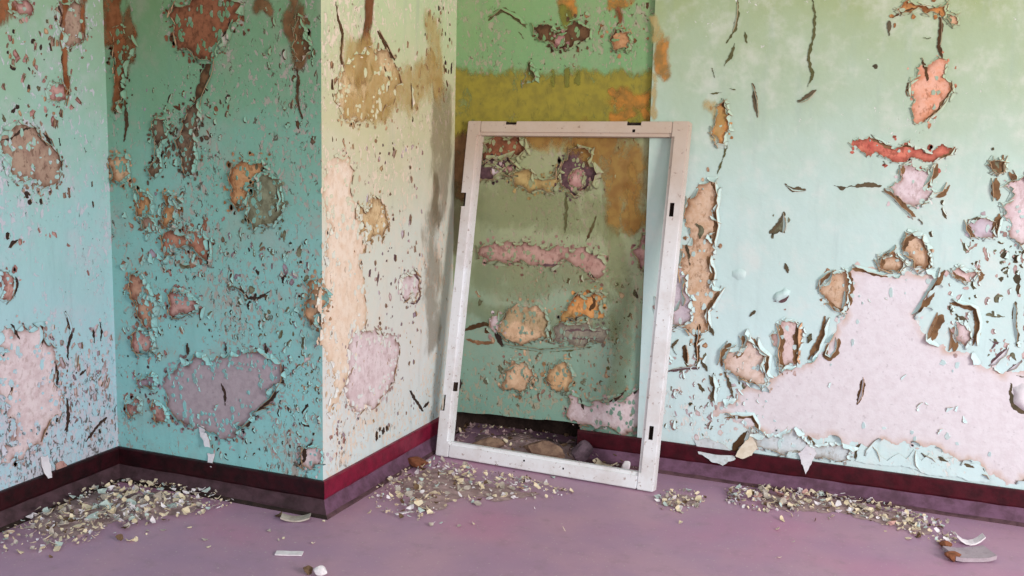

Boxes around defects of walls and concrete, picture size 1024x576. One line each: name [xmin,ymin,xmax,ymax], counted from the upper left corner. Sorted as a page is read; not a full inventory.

peeling [0,0,452,479]
water stain [455,67,652,137]
peeling [474,136,656,437]
peeling [521,2,649,88]
peeling [664,134,1024,487]
peeling [905,51,957,129]